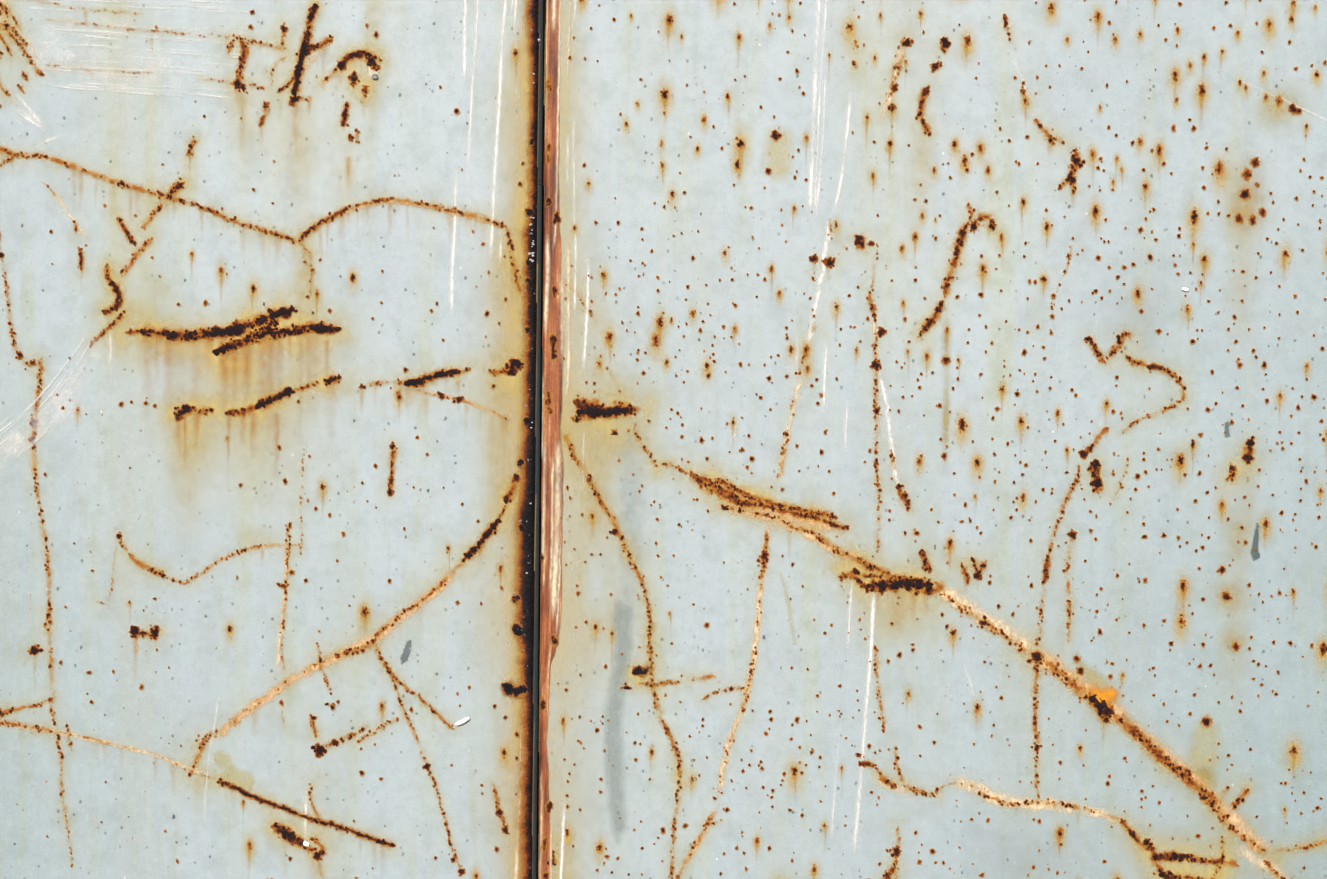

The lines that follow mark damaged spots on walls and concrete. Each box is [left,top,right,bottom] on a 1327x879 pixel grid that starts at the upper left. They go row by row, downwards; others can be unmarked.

rust [337,52,383,99]
rust [114,284,345,436]
rust [592,398,631,441]
rust [703,472,819,532]
rust [834,552,944,601]
rust [27,644,44,655]
rust [1318,642,1327,658]
rust [623,665,715,689]
rust [1073,655,1124,719]
rust [1289,746,1299,765]
rust [270,822,326,861]
rust [1120,818,1239,879]